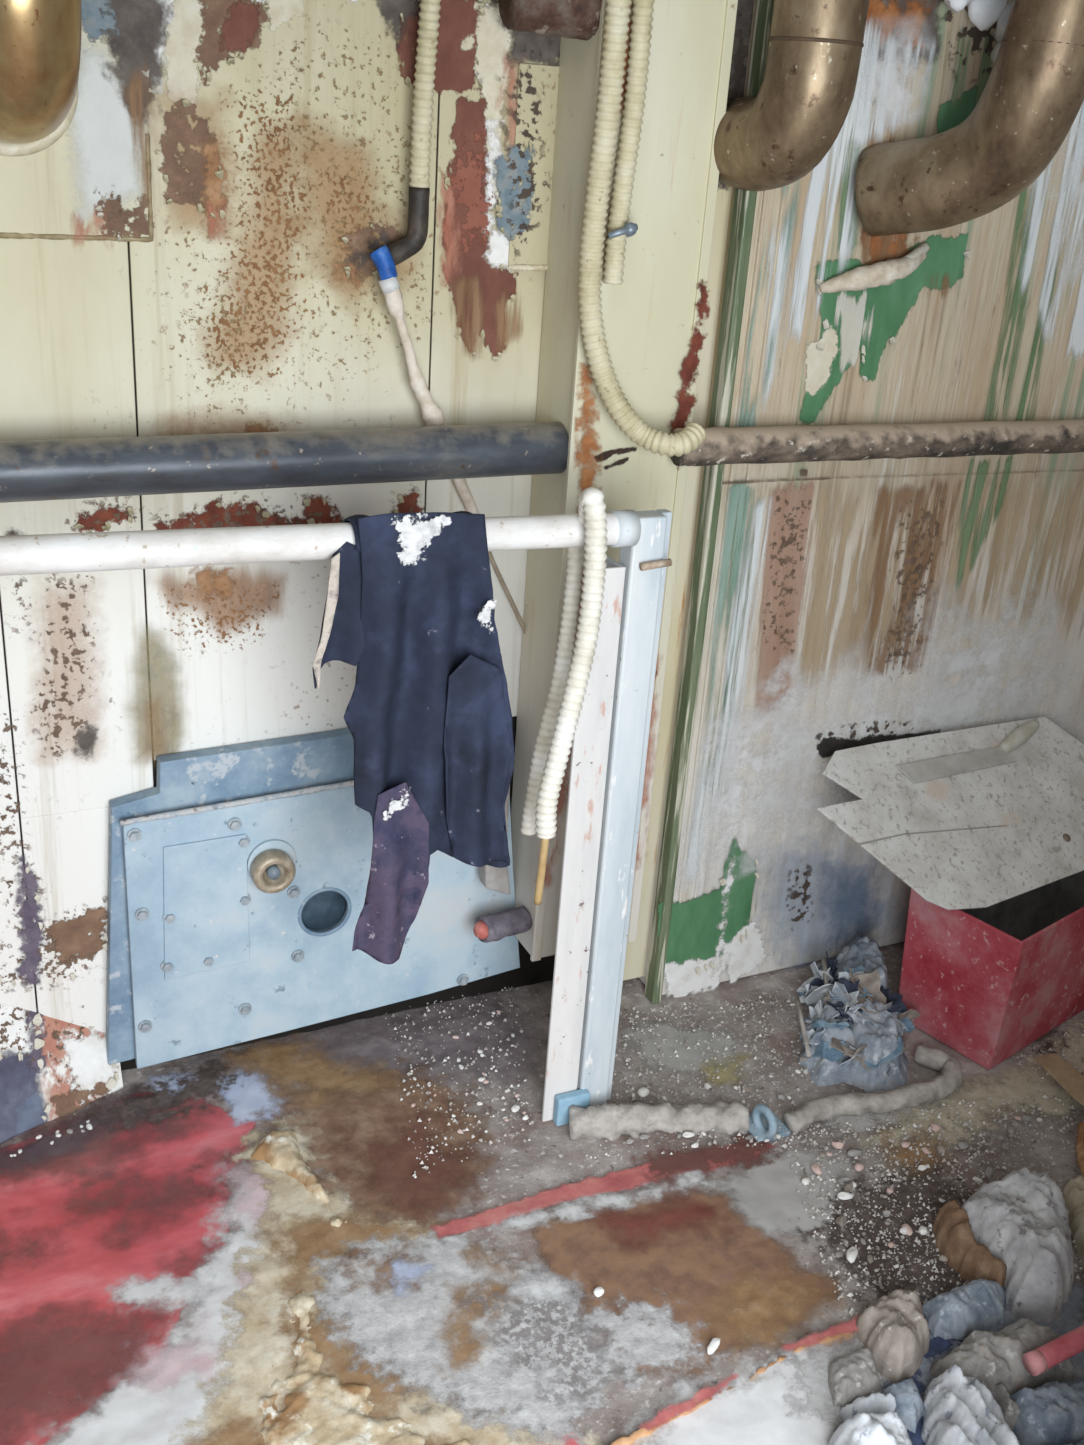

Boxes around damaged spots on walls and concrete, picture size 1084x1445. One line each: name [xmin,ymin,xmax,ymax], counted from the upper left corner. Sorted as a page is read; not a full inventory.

peeling [142,0,304,105]
peeling [377,0,421,89]
rust [76,30,425,433]
peeling [433,0,549,362]
rust [670,280,710,432]
peeling [800,136,970,424]
rust [14,576,98,756]
rust [157,567,280,650]
rust [757,481,814,717]
rust [0,713,28,901]
peeling [0,855,119,1144]
peeling [658,838,770,998]